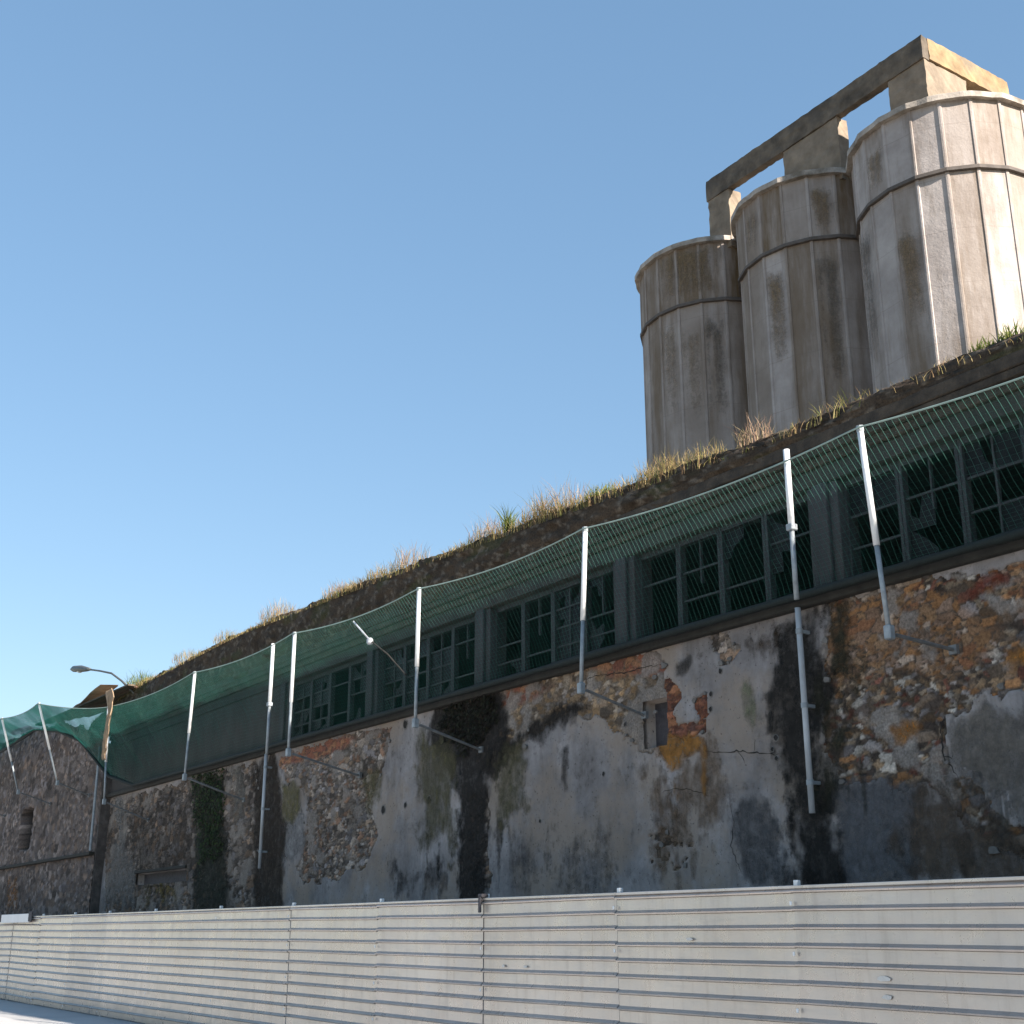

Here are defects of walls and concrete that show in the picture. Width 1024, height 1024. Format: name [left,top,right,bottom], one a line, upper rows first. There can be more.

flaking render [279,720,408,885]
leakage [425,692,586,951]
flaking render [492,651,713,762]
crack [709,743,777,763]
leakage [734,602,1024,886]
flaking render [821,561,1024,854]